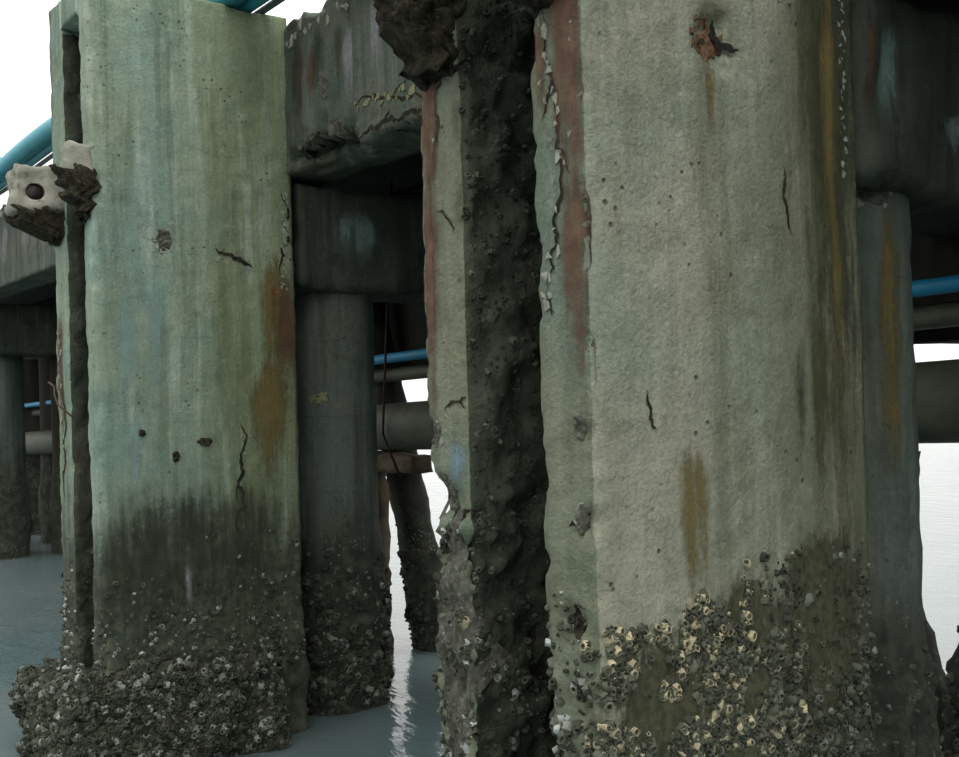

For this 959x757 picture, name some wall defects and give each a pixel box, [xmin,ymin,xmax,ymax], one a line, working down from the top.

peeling [285,1,350,50]
spalling [152,226,172,254]
crack [354,78,441,146]
corrosion [421,82,438,392]
crack [536,8,573,315]
corrosion [535,0,593,366]
corrosion [251,261,294,464]
leakage [111,490,277,618]
spalling [196,437,213,447]
crack [234,425,248,567]
spalling [435,472,510,757]
corrosion [684,457,707,577]